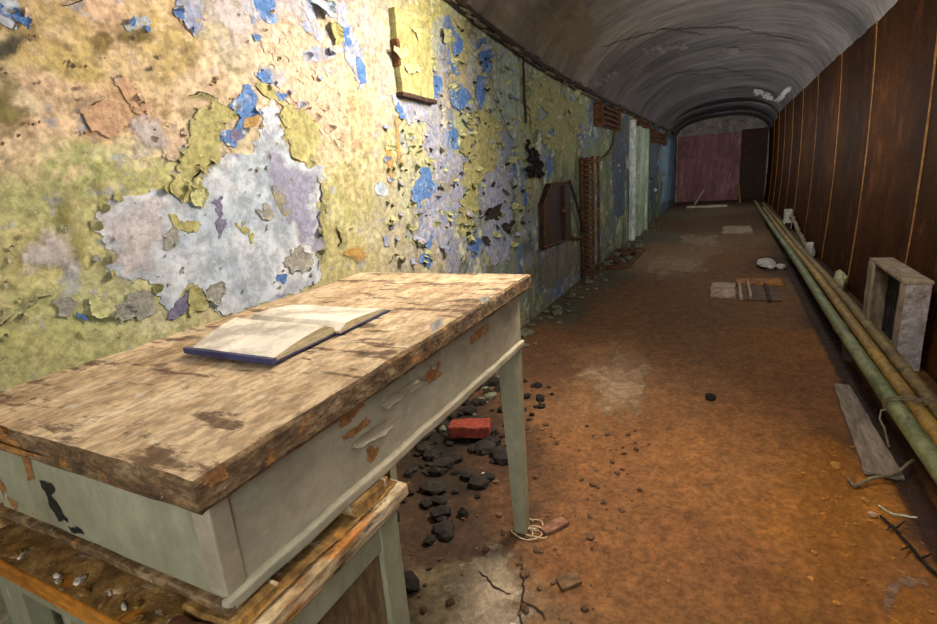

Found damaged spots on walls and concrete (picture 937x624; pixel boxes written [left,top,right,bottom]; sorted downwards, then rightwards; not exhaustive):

peeling [0,0,36,41]
crack [446,0,771,135]
crack [602,26,807,47]
peeling [52,0,368,323]
peeling [374,16,618,269]
peeling [612,130,627,217]
peeling [649,139,677,206]
crack [478,556,546,624]